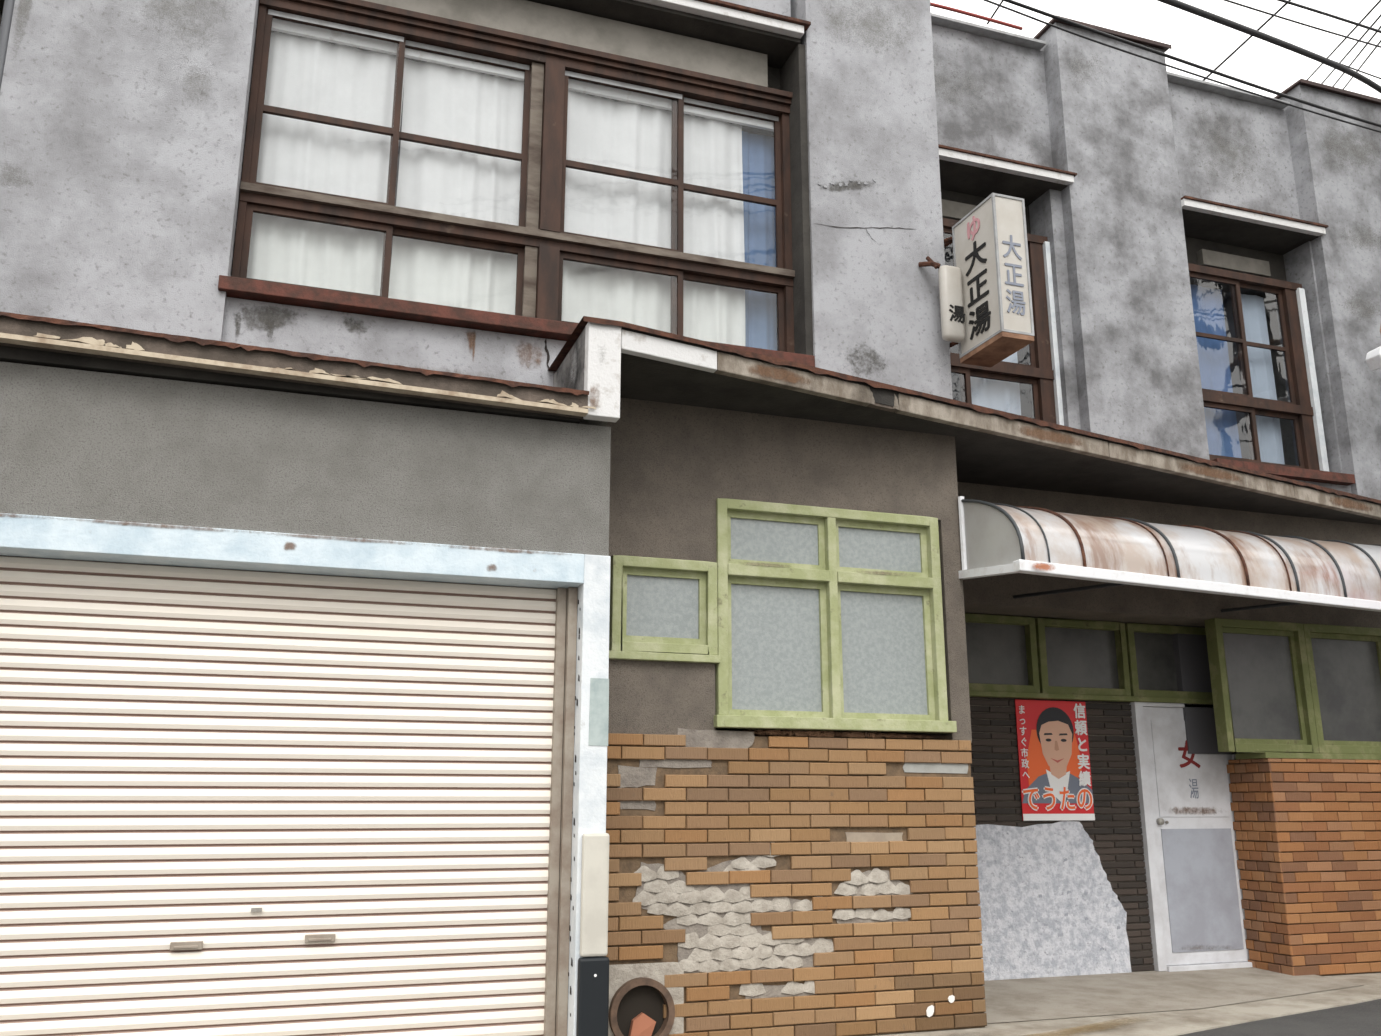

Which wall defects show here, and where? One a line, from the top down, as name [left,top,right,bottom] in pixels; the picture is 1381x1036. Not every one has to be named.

peeling [34,333,144,351]
peeling [277,367,402,385]
spalling [633,842,912,999]